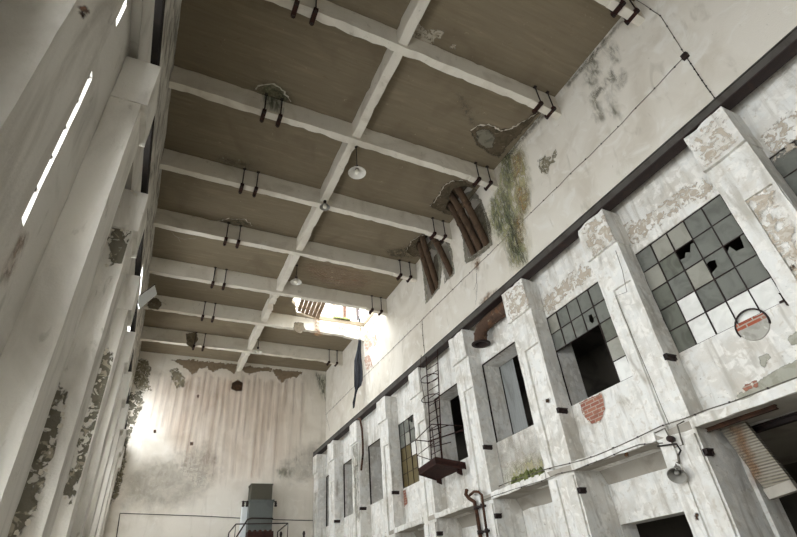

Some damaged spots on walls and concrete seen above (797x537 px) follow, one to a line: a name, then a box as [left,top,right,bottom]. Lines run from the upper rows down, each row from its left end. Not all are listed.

spalling [471,112,539,156]
peeling [691,118,738,167]
peeling [105,228,131,267]
leakage [492,115,544,262]
peeling [623,179,713,244]
peeling [746,189,797,279]
peeling [8,382,68,537]
peeling [63,348,113,504]
peeling [110,359,152,504]
flaking render [170,359,302,392]
flaking render [579,393,605,424]
flaking render [735,354,797,402]